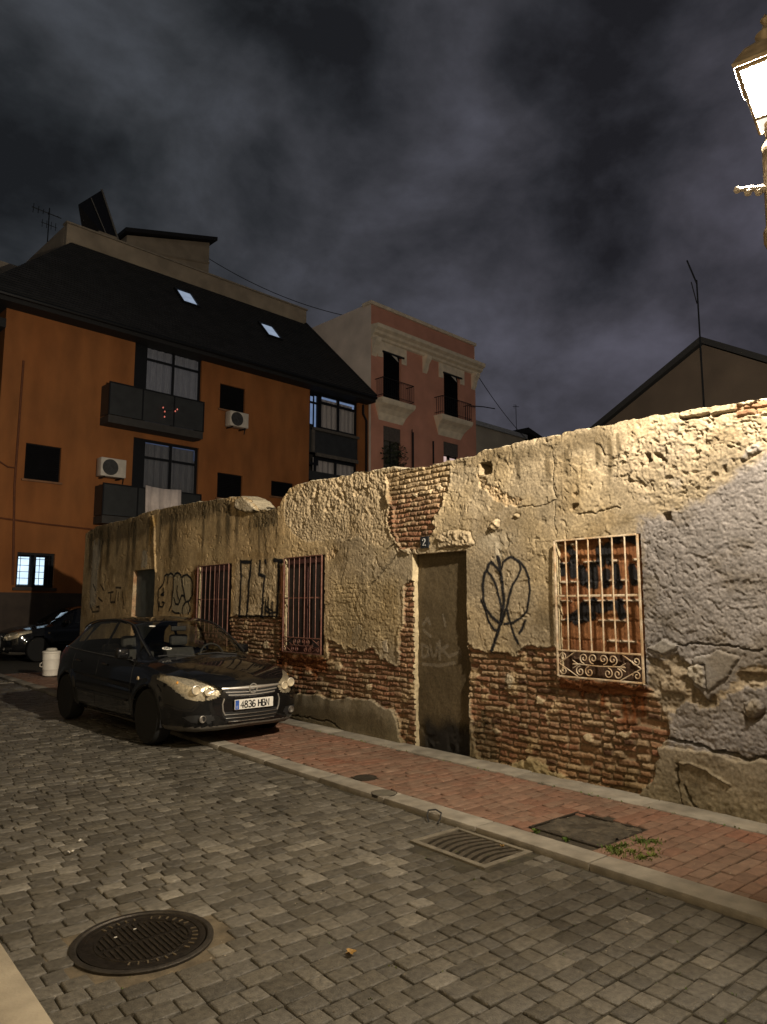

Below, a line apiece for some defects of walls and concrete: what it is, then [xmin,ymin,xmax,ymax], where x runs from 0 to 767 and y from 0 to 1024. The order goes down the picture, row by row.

flaking render [284,461,453,561]
flaking render [226,578,416,745]
flaking render [467,639,767,794]
crack [669,737,767,807]